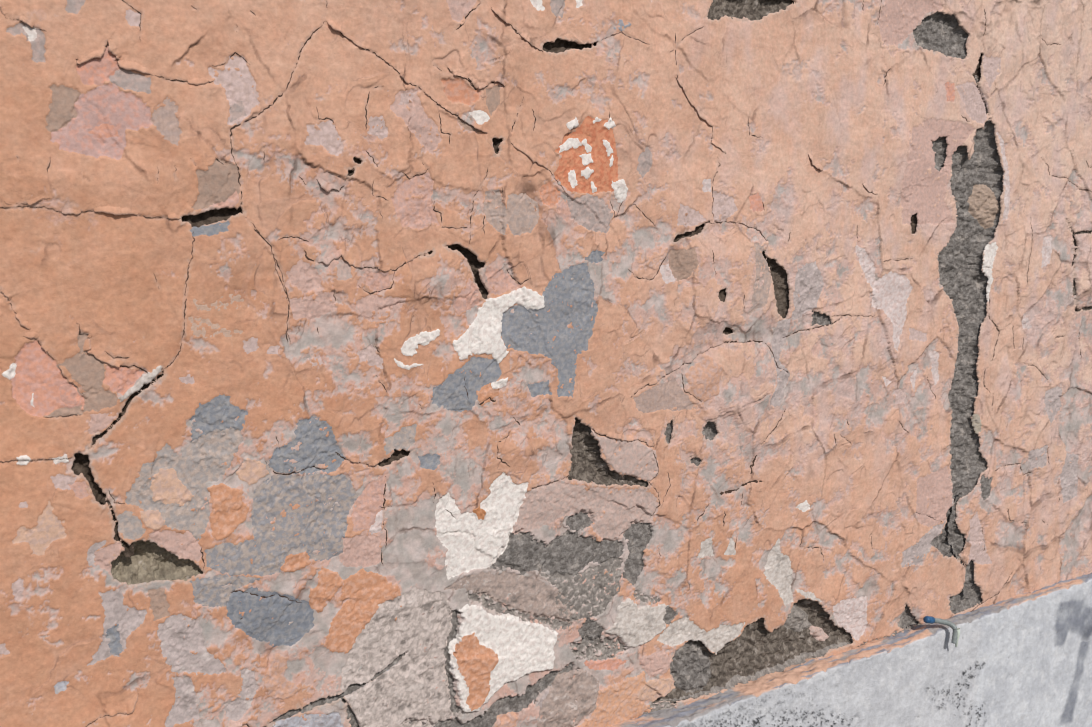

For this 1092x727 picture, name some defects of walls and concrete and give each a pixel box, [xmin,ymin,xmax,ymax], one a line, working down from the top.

crack [157,4,568,343]
peeling [482,116,628,236]
peeling [0,289,148,418]
crack [0,160,195,445]
spalling [901,55,1010,614]
crack [1056,230,1092,357]
crack [100,491,134,558]
peeling [140,468,202,562]
peeling [265,428,922,727]
crack [694,411,785,548]
peeling [87,587,226,727]
crack [270,653,405,727]